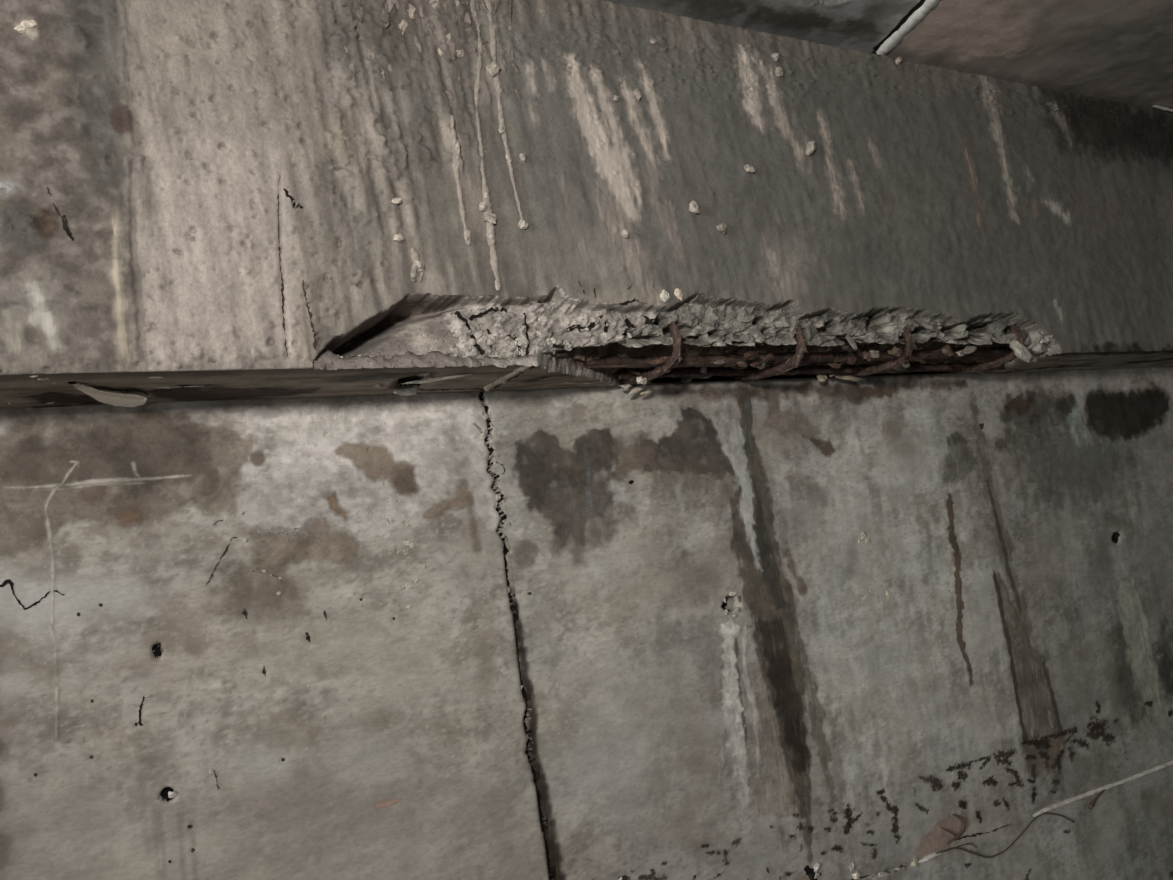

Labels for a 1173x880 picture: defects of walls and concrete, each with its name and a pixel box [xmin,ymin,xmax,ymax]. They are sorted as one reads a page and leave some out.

efflorescence [560,54,683,306]
efflorescence [738,46,844,213]
spalling [311,285,1173,396]
leakage [0,387,500,607]
crack [420,357,556,880]
leakage [515,387,900,862]
corrosion [584,322,1063,788]
leakage [995,387,1169,497]
crack [804,863,821,880]
crack [849,859,919,880]
crack [955,824,1011,841]
leakage [915,701,1117,823]